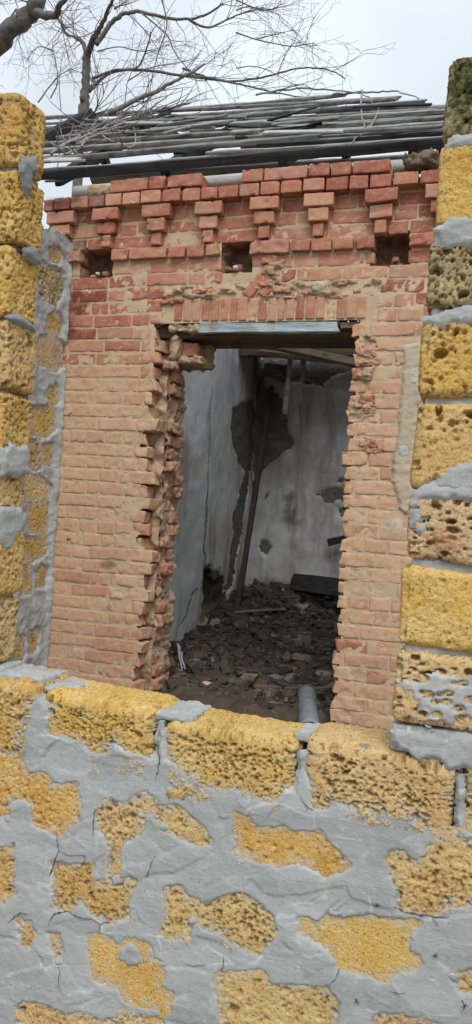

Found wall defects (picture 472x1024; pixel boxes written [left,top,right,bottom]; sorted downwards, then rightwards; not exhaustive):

spalling [160,241,382,323]
peeling [199,333,386,624]
crack [49,834,86,877]